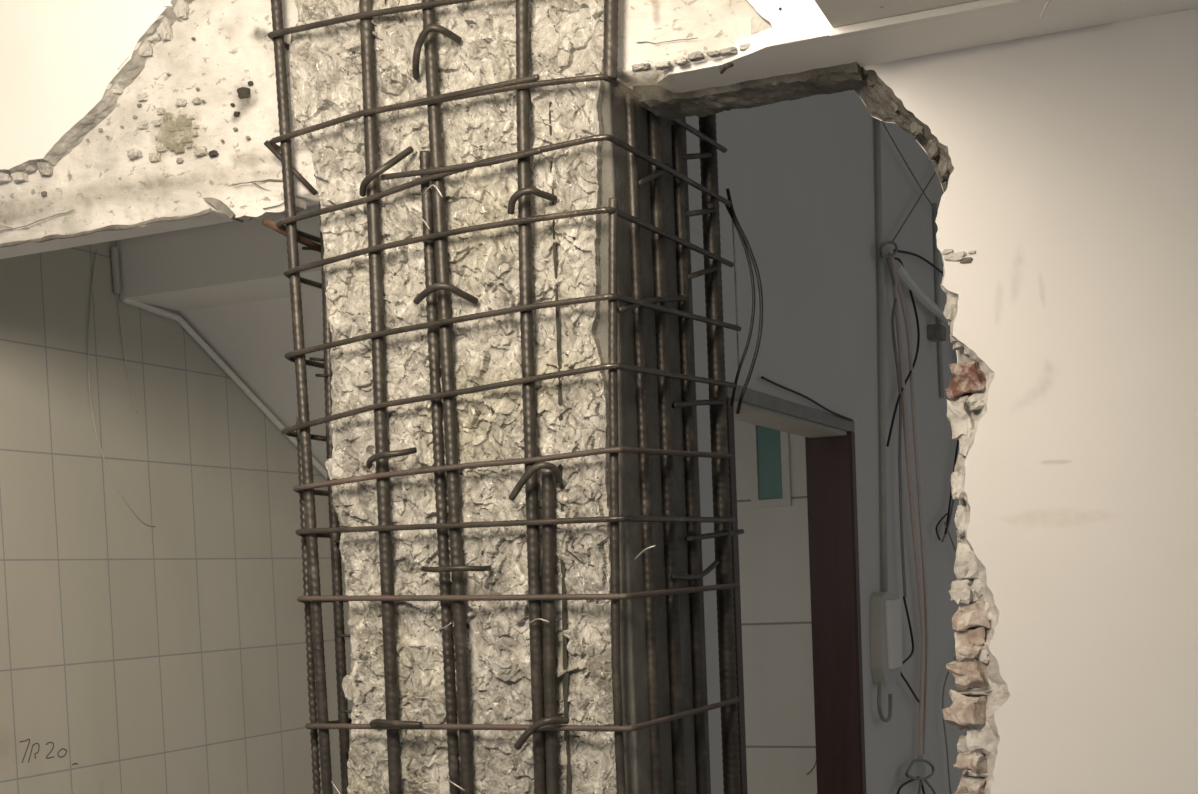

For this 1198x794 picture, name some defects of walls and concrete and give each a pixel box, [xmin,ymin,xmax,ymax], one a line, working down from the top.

spalling [0,0,195,184]
spalling [208,81,253,157]
spalling [289,0,617,794]